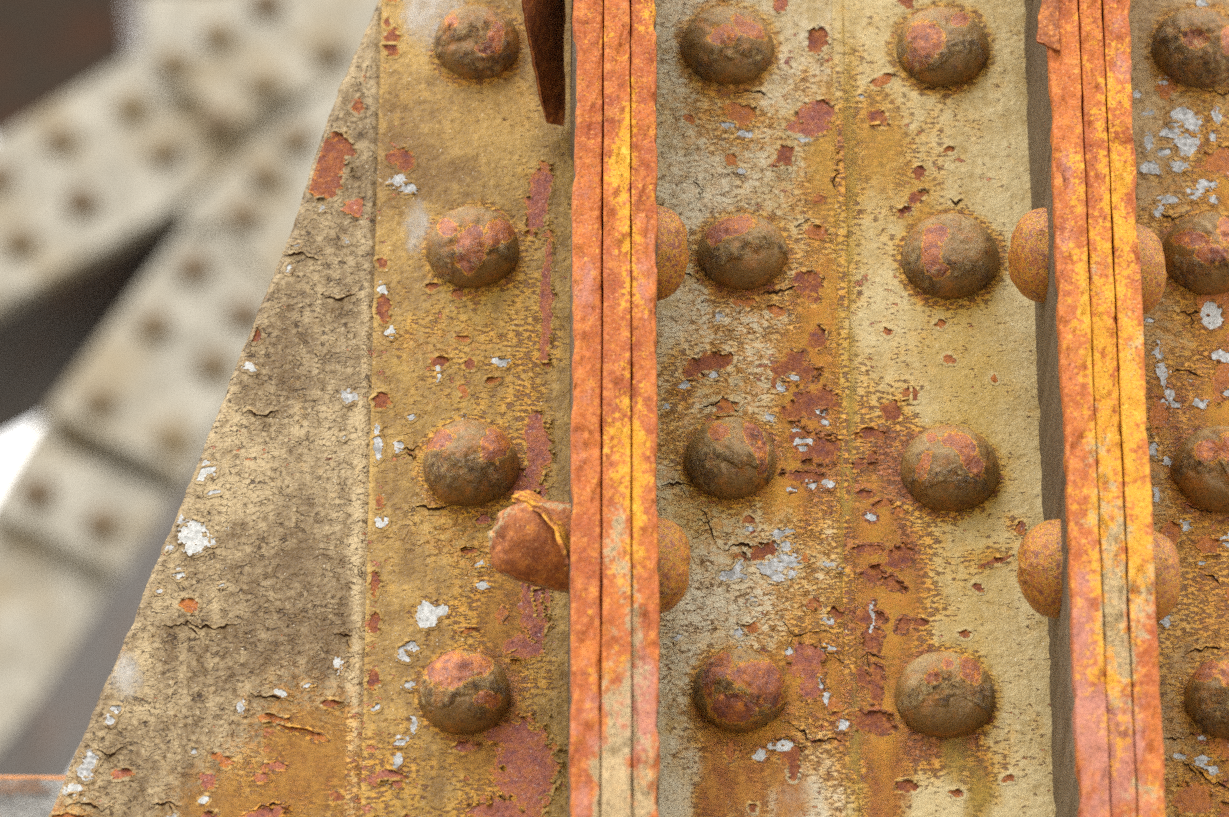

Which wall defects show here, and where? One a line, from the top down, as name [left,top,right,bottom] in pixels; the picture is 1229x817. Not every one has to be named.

corrosion [1036,0,1061,52]
corrosion [308,129,363,218]
peeling [1133,76,1225,220]
peeling [1197,298,1228,333]
peeling [1143,314,1229,411]
corrosion [509,408,570,569]
peeling [715,523,846,607]
corrosion [729,253,932,817]
corrosion [494,583,557,664]
peeling [274,678,318,700]
peeling [62,749,102,799]
corrosion [450,710,568,817]